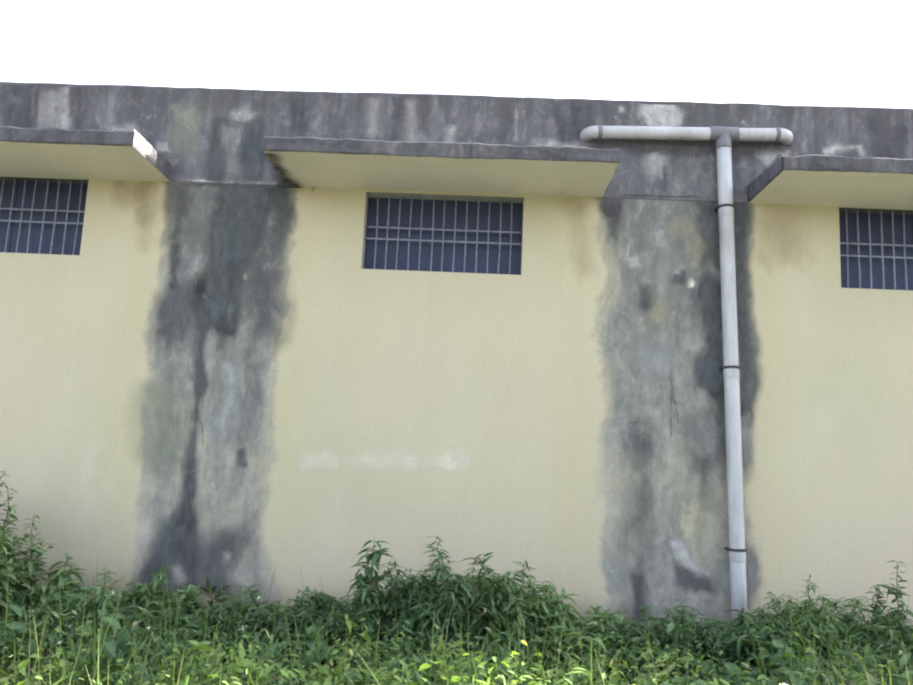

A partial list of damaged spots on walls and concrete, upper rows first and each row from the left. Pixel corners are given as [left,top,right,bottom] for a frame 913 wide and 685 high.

leakage [28,85,73,130]
leakage [221,121,276,184]
leakage [446,126,456,143]
leakage [593,139,715,154]
leakage [731,142,789,157]
leakage [170,245,178,289]
leakage [194,313,207,415]
leakage [687,393,724,470]
leakage [741,413,752,472]
leakage [181,434,237,599]